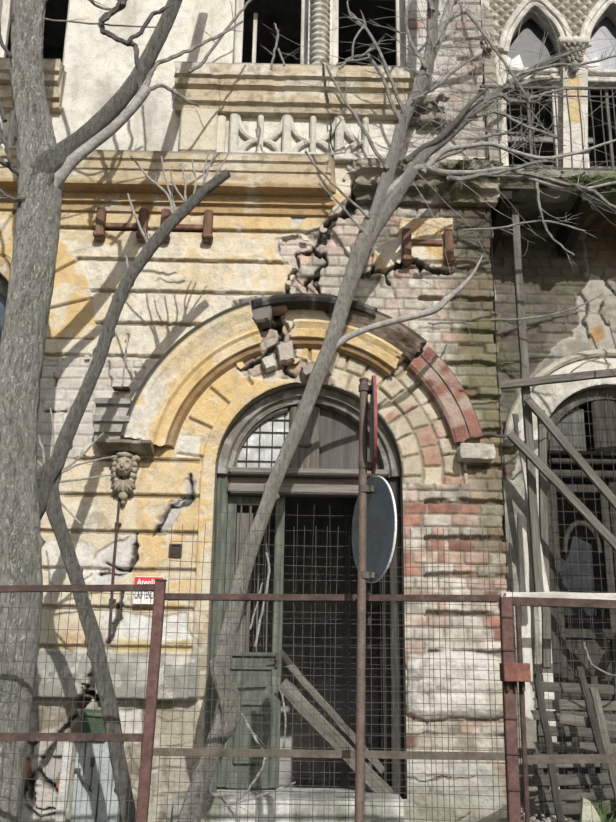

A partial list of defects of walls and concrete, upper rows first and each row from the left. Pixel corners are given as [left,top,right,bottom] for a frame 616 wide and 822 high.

spalling [153,195,371,296]
spalling [236,312,315,383]
crack [360,257,454,286]
spalling [353,206,498,382]
spalling [561,301,580,340]
spalling [37,355,93,458]
spalling [67,358,146,458]
peeling [43,538,69,580]
spalling [71,531,139,585]
crack [100,473,196,644]
spalling [323,353,518,822]
crack [24,669,99,809]